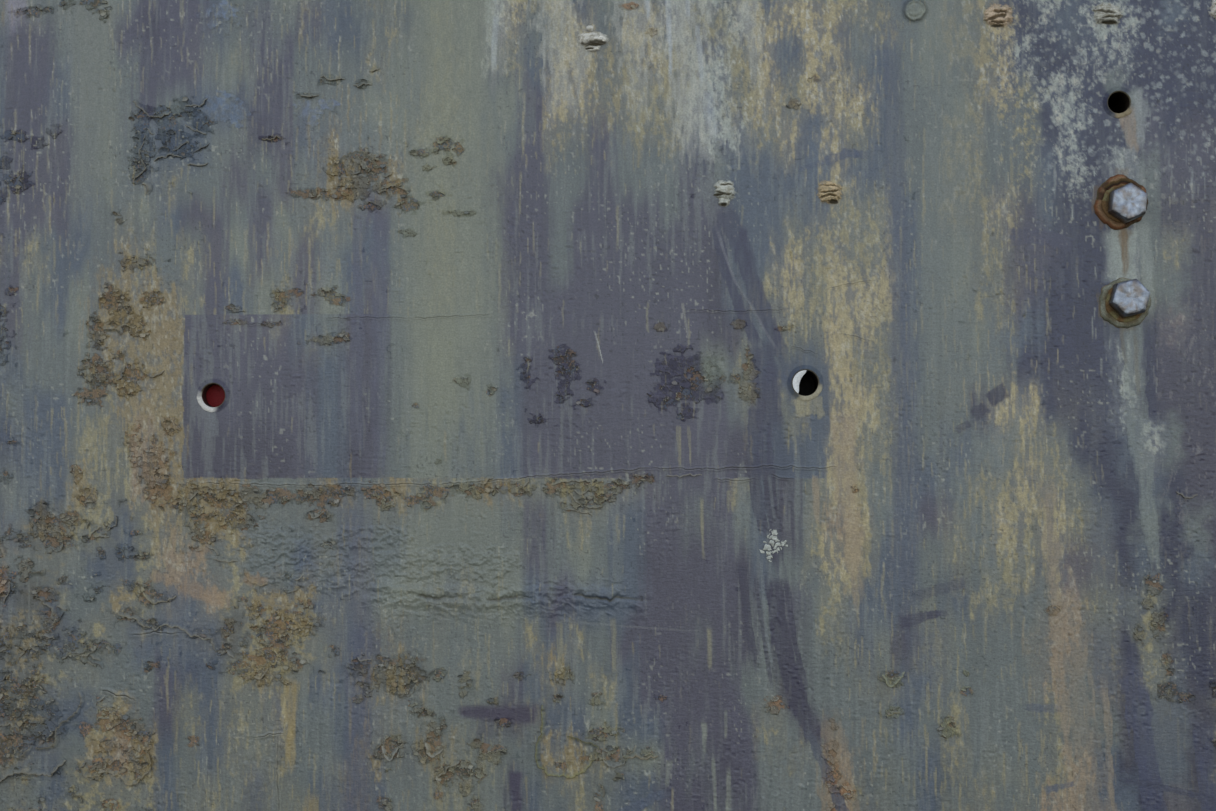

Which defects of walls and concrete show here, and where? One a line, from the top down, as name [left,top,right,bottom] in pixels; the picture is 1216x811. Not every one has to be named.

peeling [294,66,380,100]
peeling [127,95,218,195]
peeling [258,133,290,145]
peeling [285,135,477,238]
rust [1118,228,1129,278]
peeling [0,285,19,367]
peeling [71,248,170,409]
peeling [222,277,351,328]
peeling [296,326,362,346]
peeling [727,318,762,406]
peeling [0,414,659,811]